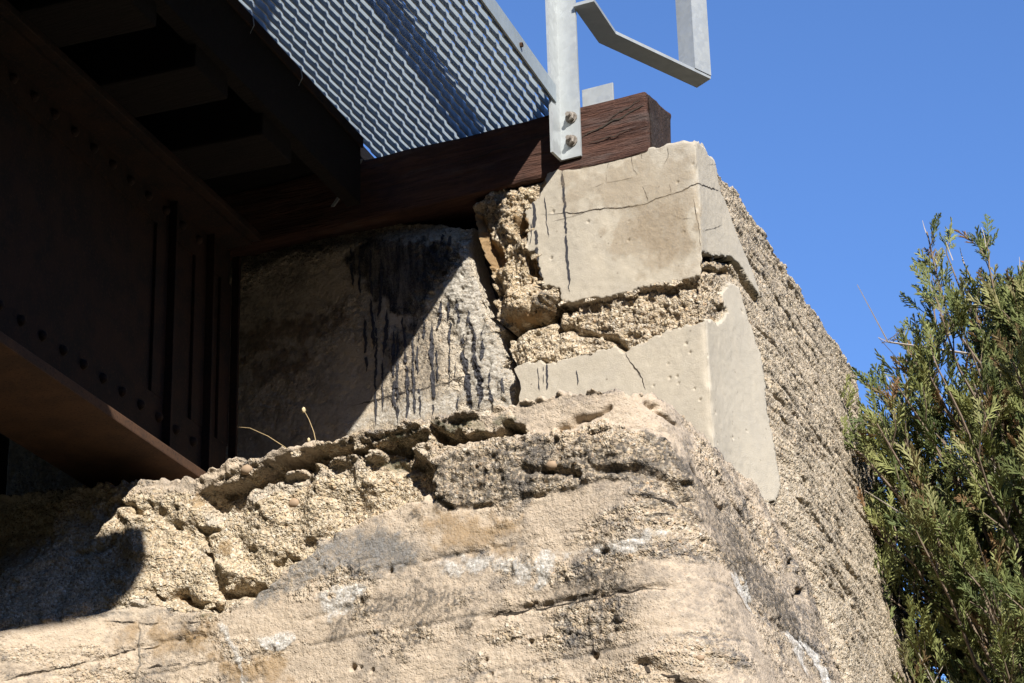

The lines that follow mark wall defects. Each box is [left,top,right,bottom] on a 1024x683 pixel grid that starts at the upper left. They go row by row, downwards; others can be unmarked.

damp [343,198,568,445]
spalling [453,187,734,404]
crack [544,154,740,280]
spalling [0,426,508,629]
crack [483,587,658,657]
crack [644,665,685,683]